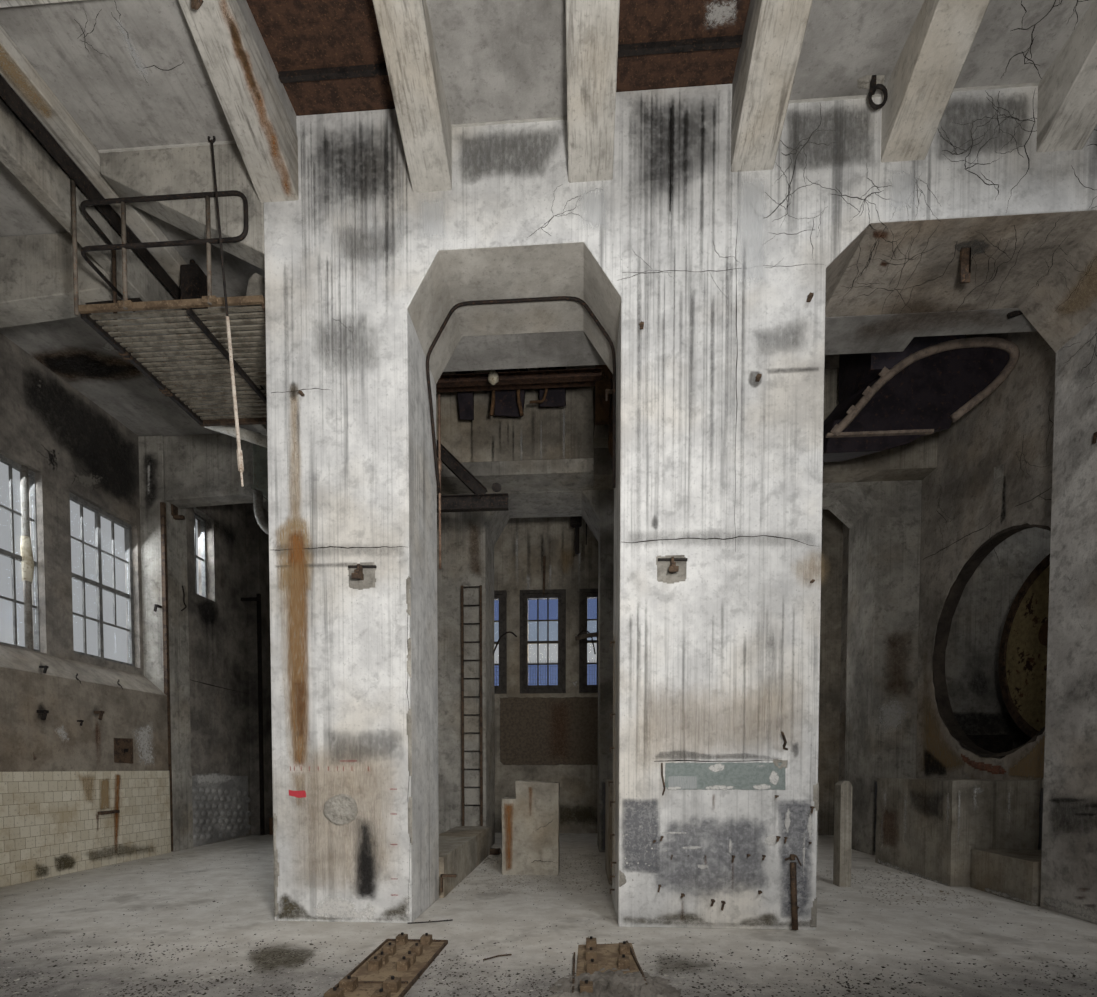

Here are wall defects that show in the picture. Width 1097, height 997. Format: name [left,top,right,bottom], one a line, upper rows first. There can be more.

crack [74,0,184,82]
corrosion [223,1,290,194]
crack [621,0,1097,564]
corrosion [279,504,311,764]